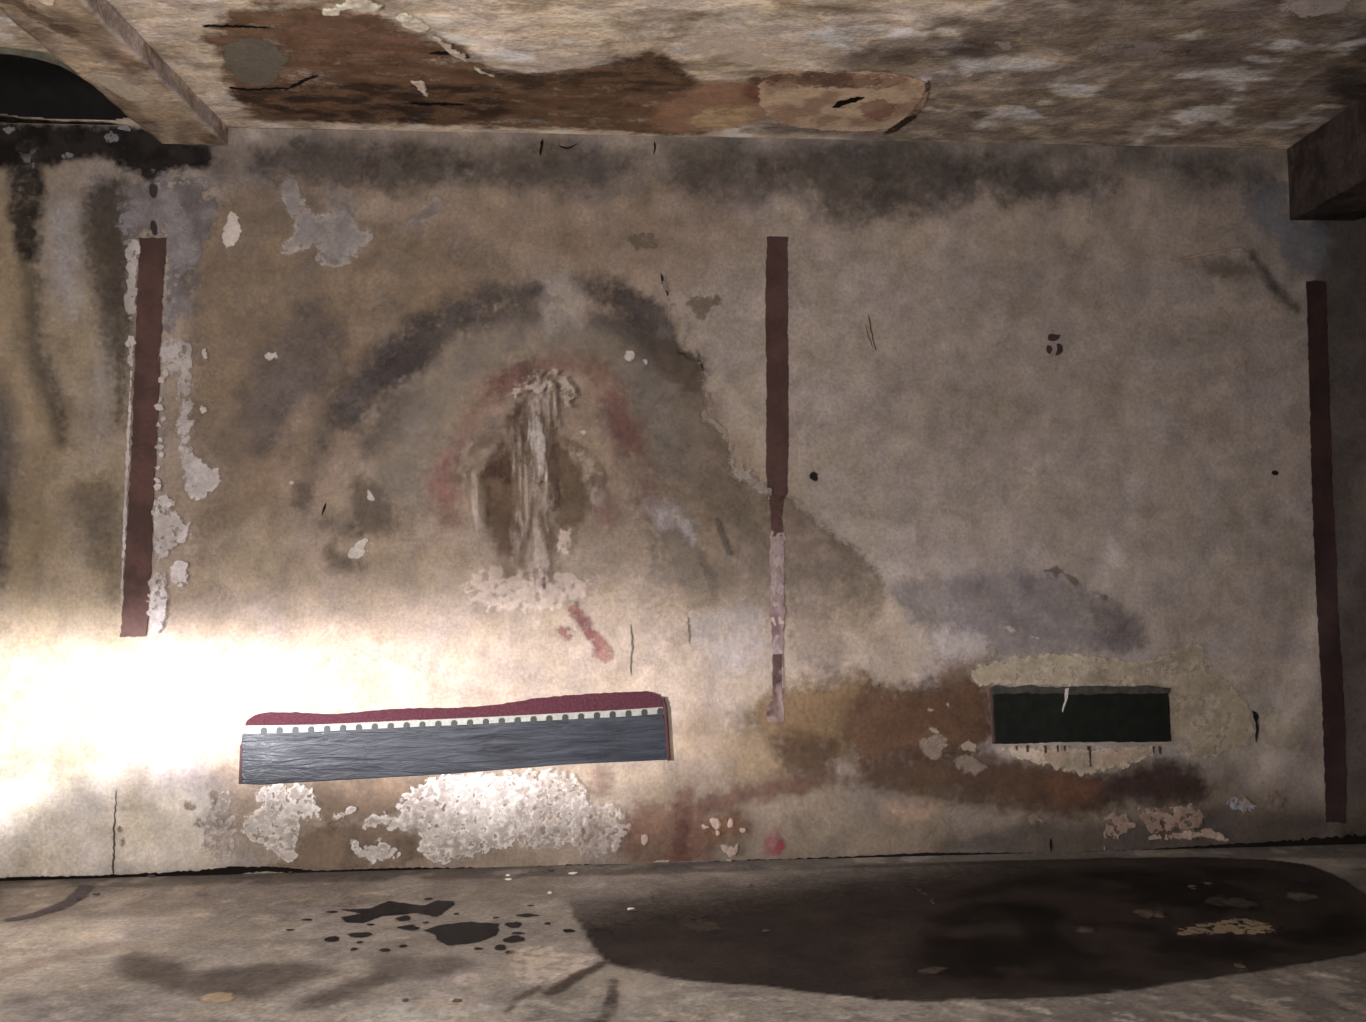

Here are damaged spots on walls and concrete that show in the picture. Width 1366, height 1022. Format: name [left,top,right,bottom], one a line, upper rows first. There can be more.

flaking render [322,0,495,77]
damp [104,124,131,143]
flaking render [411,80,429,97]
spalling [757,70,930,135]
peeling [278,175,373,268]
damp [0,126,63,569]
damp [83,169,881,659]
flaking render [972,643,1256,758]
peeling [184,769,592,865]
flaking render [1001,744,1157,777]
corrosion [1063,761,1206,803]
damp [575,857,1366,1001]